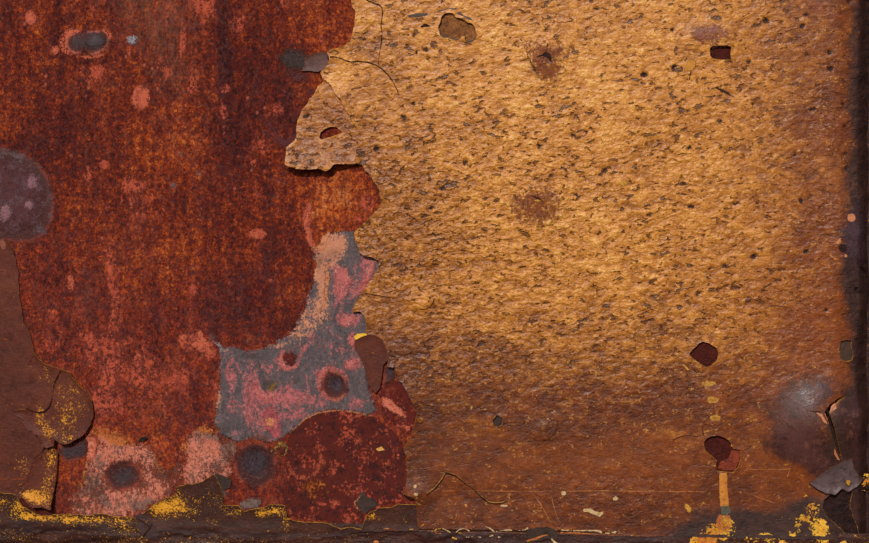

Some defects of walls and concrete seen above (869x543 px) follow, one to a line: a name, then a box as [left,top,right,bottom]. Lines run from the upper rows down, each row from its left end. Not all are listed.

crack [327,0,399,96]
corrosion [0,0,417,524]
peeling [285,0,869,543]
peeling [0,230,379,537]
crack [811,395,852,460]
peeling [134,474,448,541]
crack [404,471,507,505]
crack [410,524,528,540]
crack [556,527,616,535]